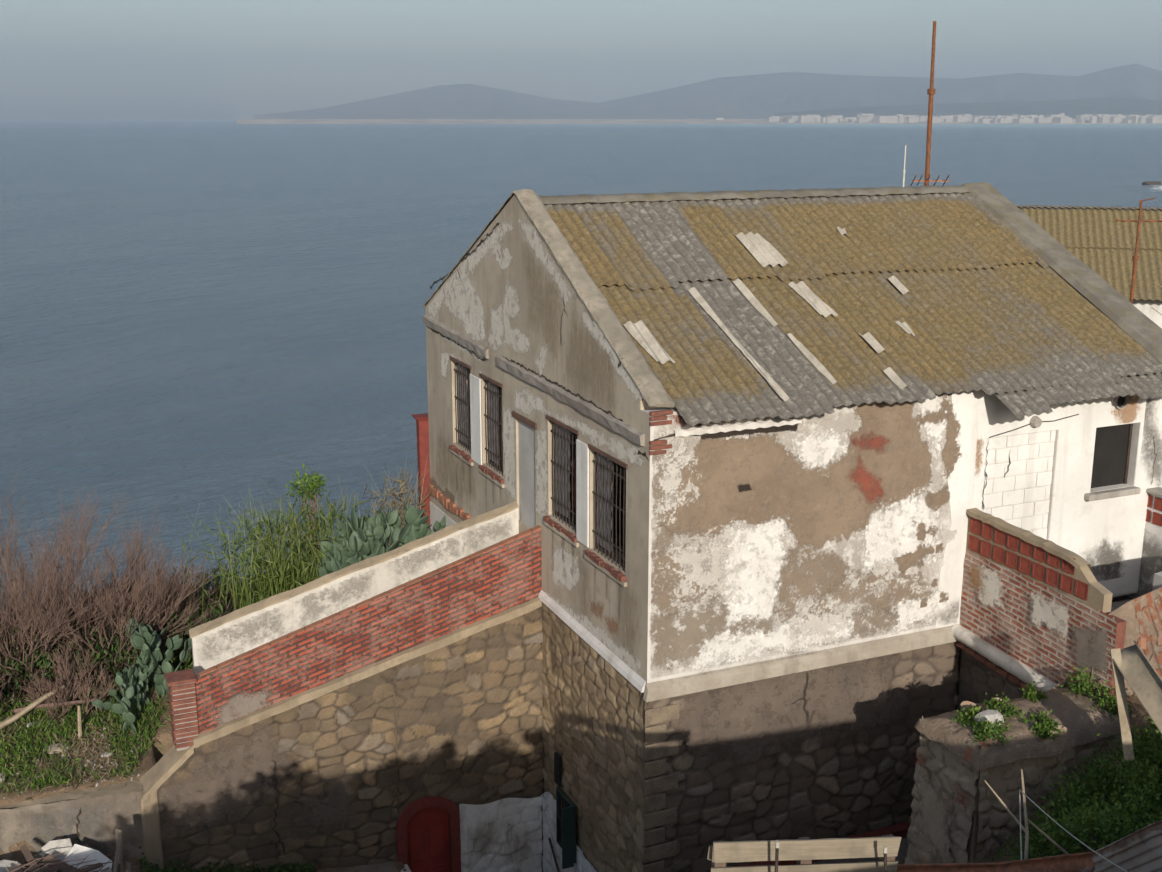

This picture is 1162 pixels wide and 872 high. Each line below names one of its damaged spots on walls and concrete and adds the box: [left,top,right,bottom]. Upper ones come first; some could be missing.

peeling [428,217,572,378]
spalling [428,478,470,521]
flaking render [502,310,962,674]
damp [1114,394,1162,481]